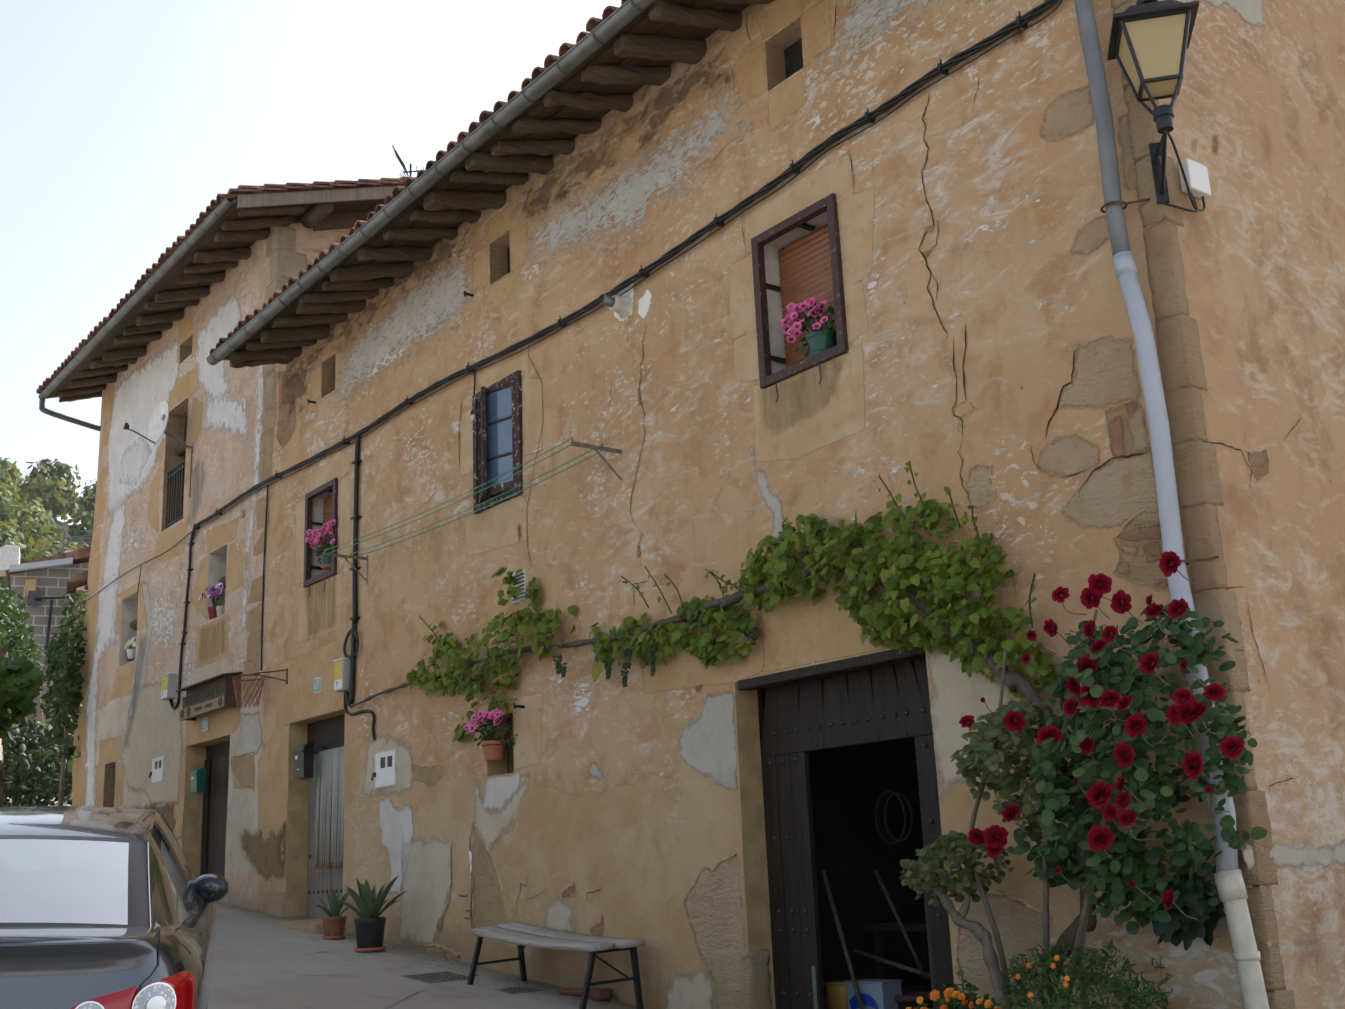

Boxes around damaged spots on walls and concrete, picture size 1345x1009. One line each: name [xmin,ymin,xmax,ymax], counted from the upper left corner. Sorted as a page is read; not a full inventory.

peeling [85,340,179,807]
peeling [148,587,195,684]
peeling [195,290,315,677]
peeling [337,250,474,401]
crack [610,323,647,589]
crack [918,91,970,503]
spalling [1028,289,1169,592]
spalling [472,823,508,936]
spalling [683,850,747,980]